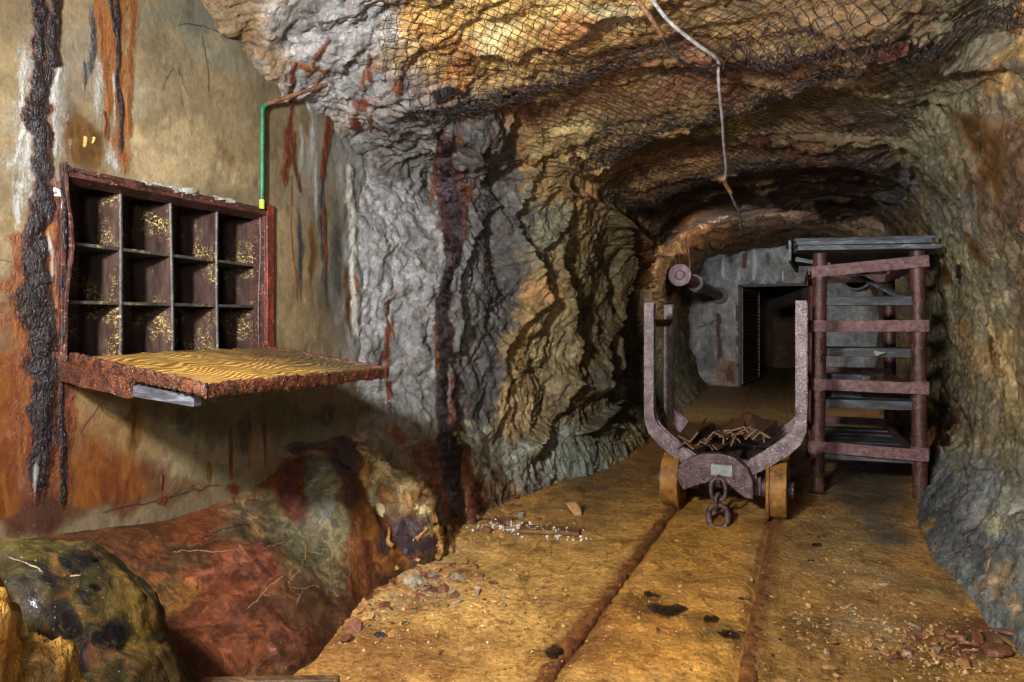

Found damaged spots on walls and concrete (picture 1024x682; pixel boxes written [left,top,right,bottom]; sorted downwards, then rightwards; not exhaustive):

corrosion [0,0,174,518]
corrosion [280,38,330,299]
corrosion [248,116,480,600]